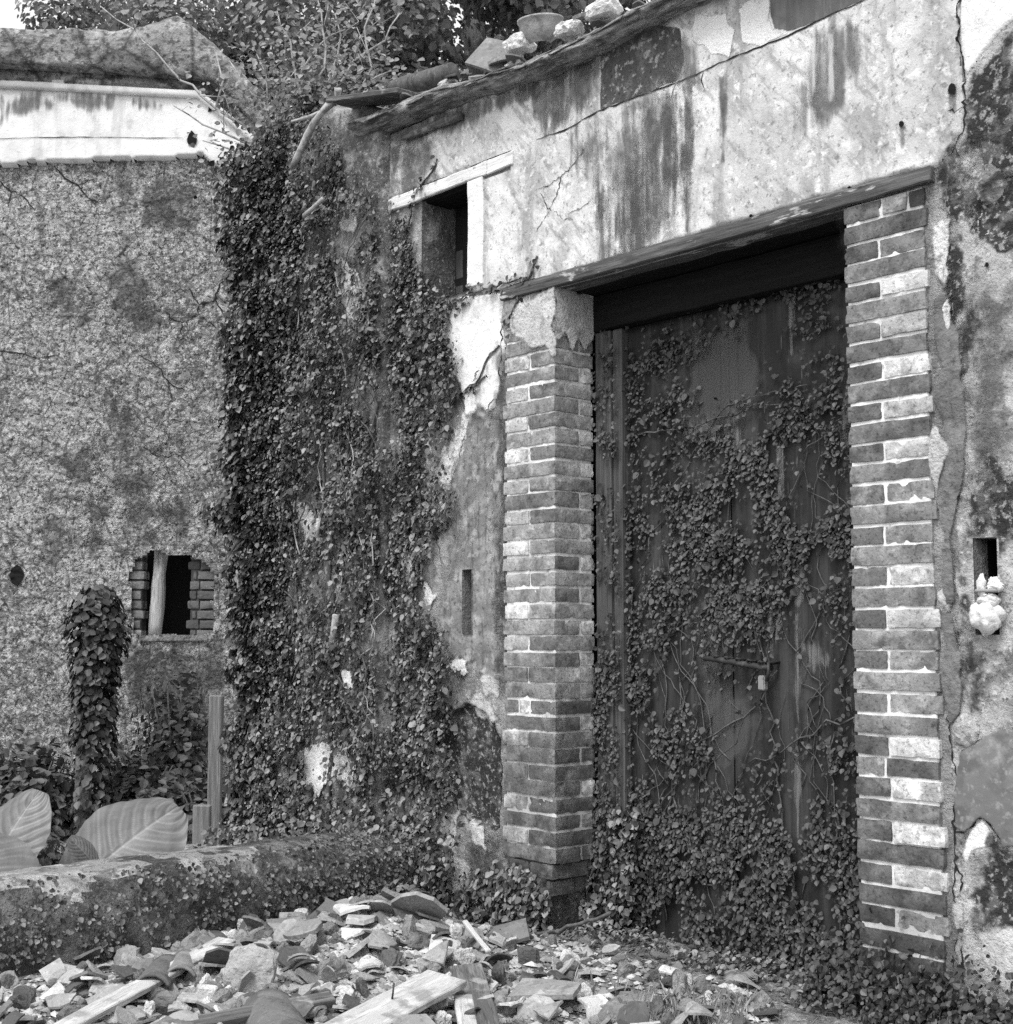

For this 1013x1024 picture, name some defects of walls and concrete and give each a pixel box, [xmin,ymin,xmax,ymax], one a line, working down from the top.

damp [0,93,51,122]
damp [610,45,695,250]
crack [536,0,864,140]
damp [803,22,857,126]
crack [946,0,967,158]
peeling [510,287,594,356]
damp [937,32,1013,552]
spalling [399,403,507,894]
damp [956,575,985,711]
peeling [963,820,990,861]
peeling [953,903,964,948]
peeling [979,927,1013,999]